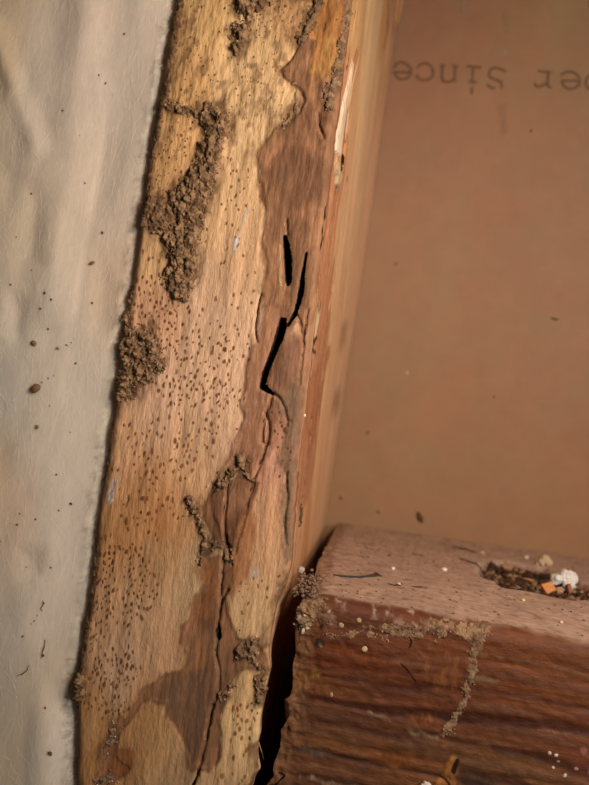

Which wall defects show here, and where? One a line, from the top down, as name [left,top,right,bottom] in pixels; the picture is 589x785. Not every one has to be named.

crack [214,569,226,651]
crack [192,703,215,785]